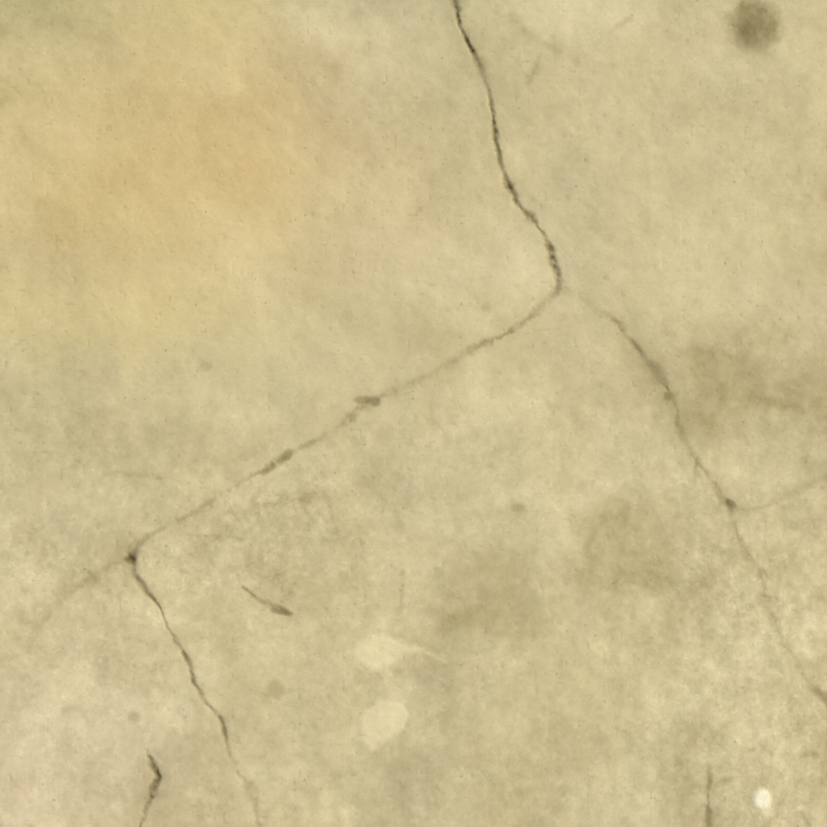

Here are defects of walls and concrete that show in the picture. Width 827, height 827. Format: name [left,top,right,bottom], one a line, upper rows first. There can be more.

damp [719,0,789,57]
crack [23,0,583,827]
crack [556,282,827,722]
crack [742,742,823,762]
crack [691,761,747,827]